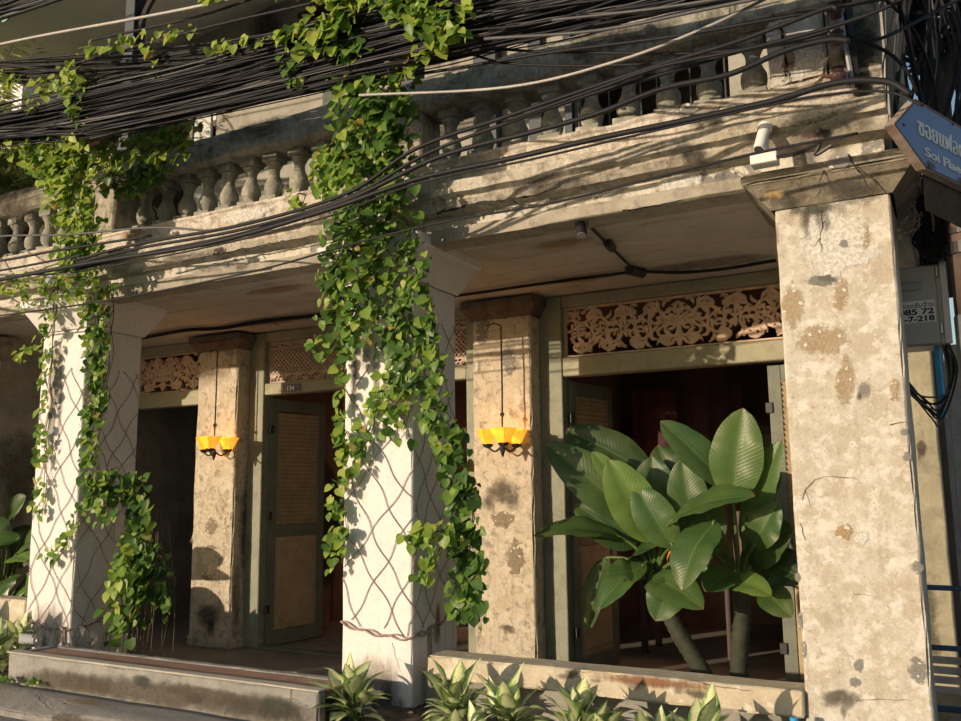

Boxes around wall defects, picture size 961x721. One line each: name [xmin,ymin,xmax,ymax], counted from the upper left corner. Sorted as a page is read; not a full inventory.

crack [848,154,872,190]
crack [436,186,561,215]
leakage [795,204,830,215]
crack [815,170,827,252]
peeling [781,205,879,402]
leakage [490,482,514,503]
crack [800,476,859,541]
leakage [825,690,858,712]